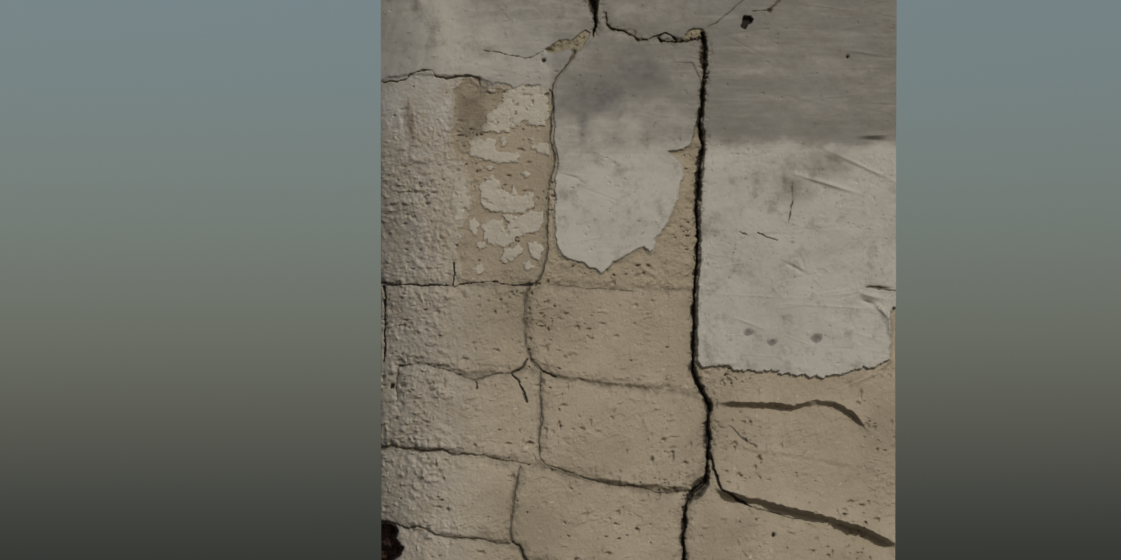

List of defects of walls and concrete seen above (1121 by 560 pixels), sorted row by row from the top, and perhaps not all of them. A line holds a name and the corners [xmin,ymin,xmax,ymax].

peeling [450,79,701,290]
crack [381,0,797,560]
crack [866,284,896,292]
spalling [381,523,404,560]